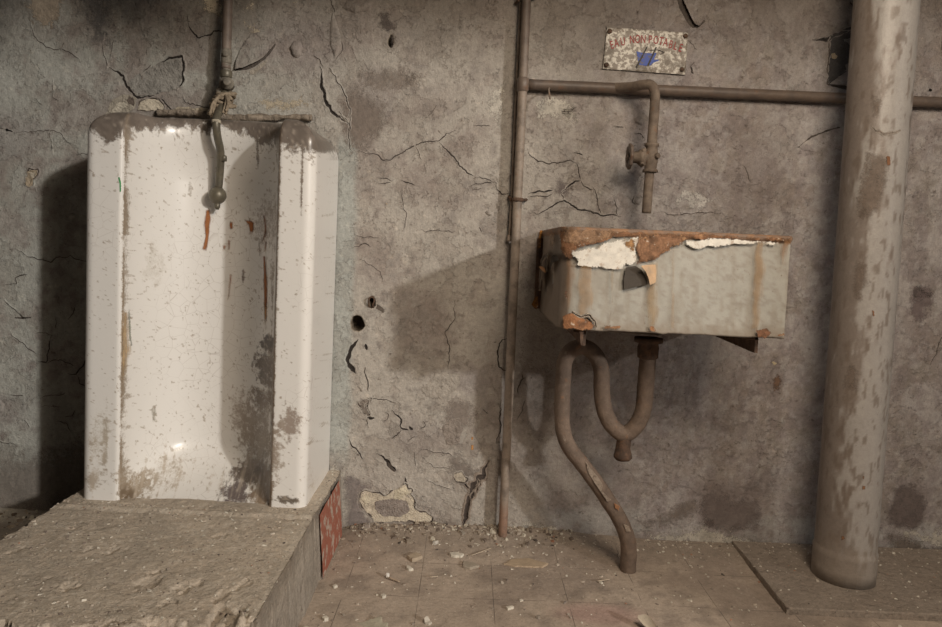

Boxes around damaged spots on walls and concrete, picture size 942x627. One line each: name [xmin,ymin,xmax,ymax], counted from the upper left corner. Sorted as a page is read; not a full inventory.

crack [688,40,697,75]
spalling [825,29,851,90]
crack [302,0,636,234]
crack [658,210,718,218]
crack [352,233,384,281]
crack [343,337,526,525]
spalling [358,482,435,524]